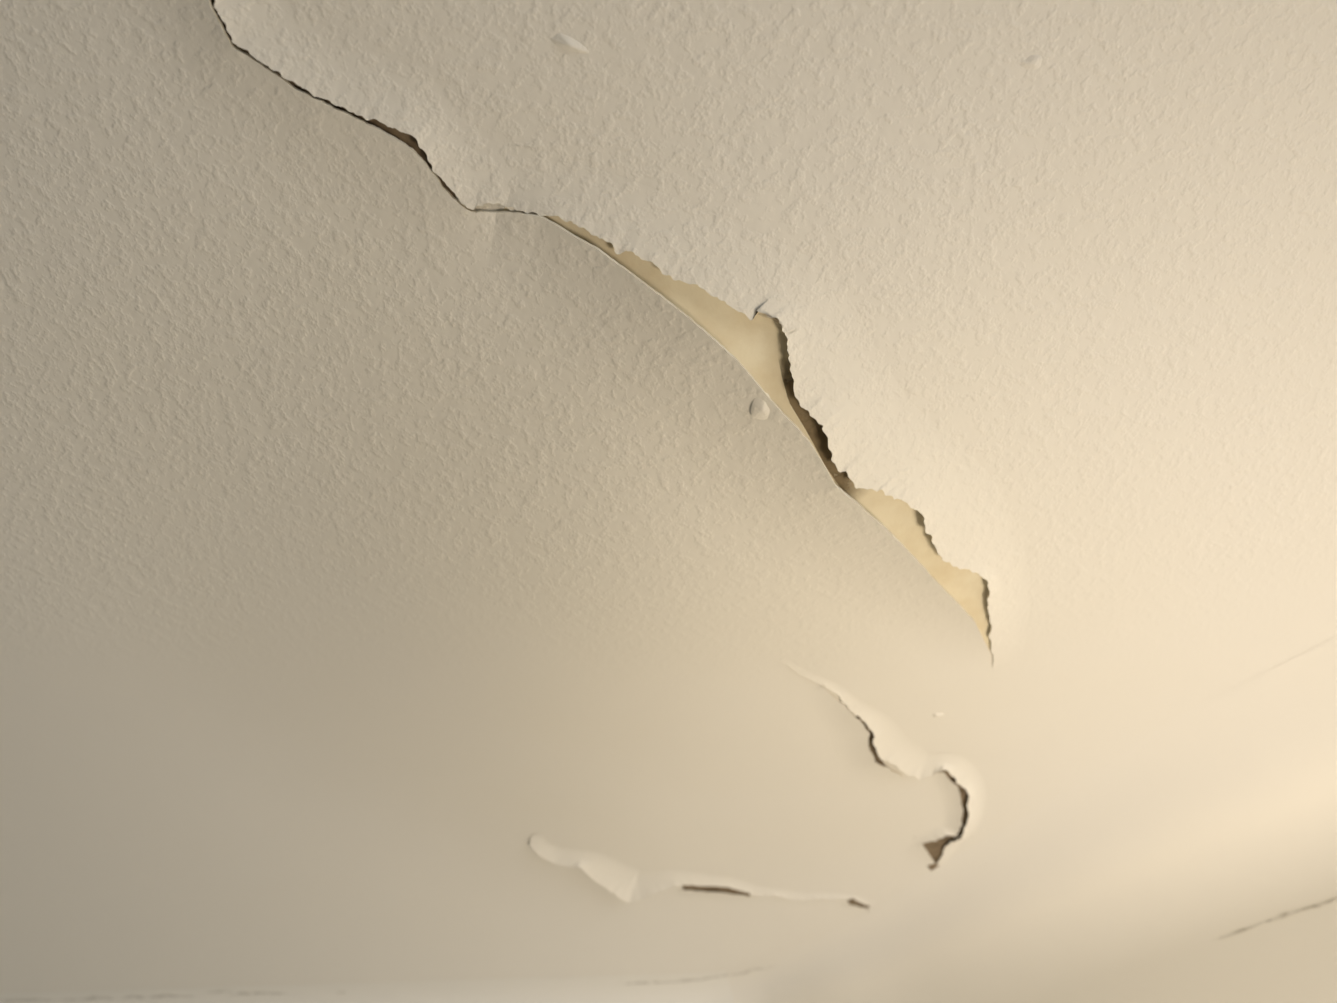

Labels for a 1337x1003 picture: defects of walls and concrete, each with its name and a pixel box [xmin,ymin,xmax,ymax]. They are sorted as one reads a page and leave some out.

peeling [477,159,1031,680]
peeling [529,833,876,913]